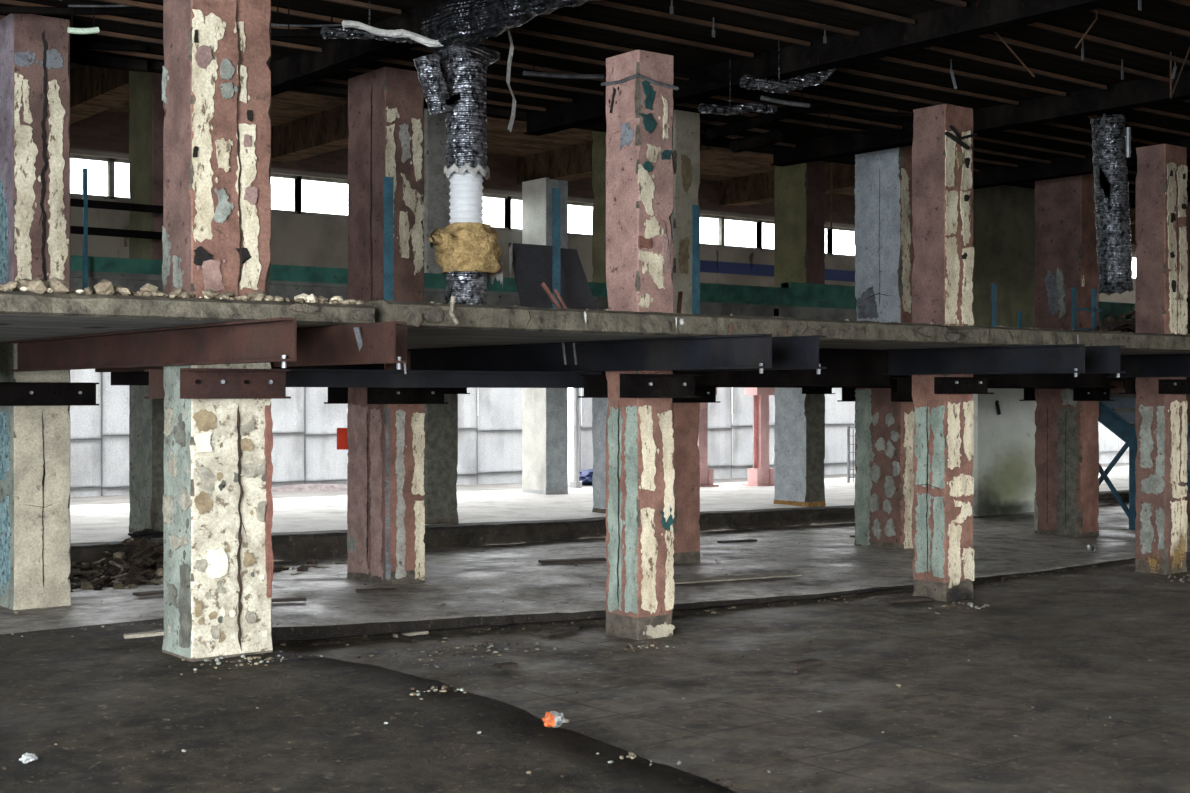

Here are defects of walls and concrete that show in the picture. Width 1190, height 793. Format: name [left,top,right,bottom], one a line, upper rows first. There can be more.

peeling [0,49,69,284]
crack [39,31,48,281]
peeling [162,9,261,291]
peeling [915,130,974,342]
flaking render [162,405,273,648]
crack [234,405,247,651]
peeling [347,403,425,580]
crack [272,405,620,642]
peeling [607,405,675,638]
crack [675,400,939,610]
peeling [903,400,975,589]
crack [972,558,1135,582]